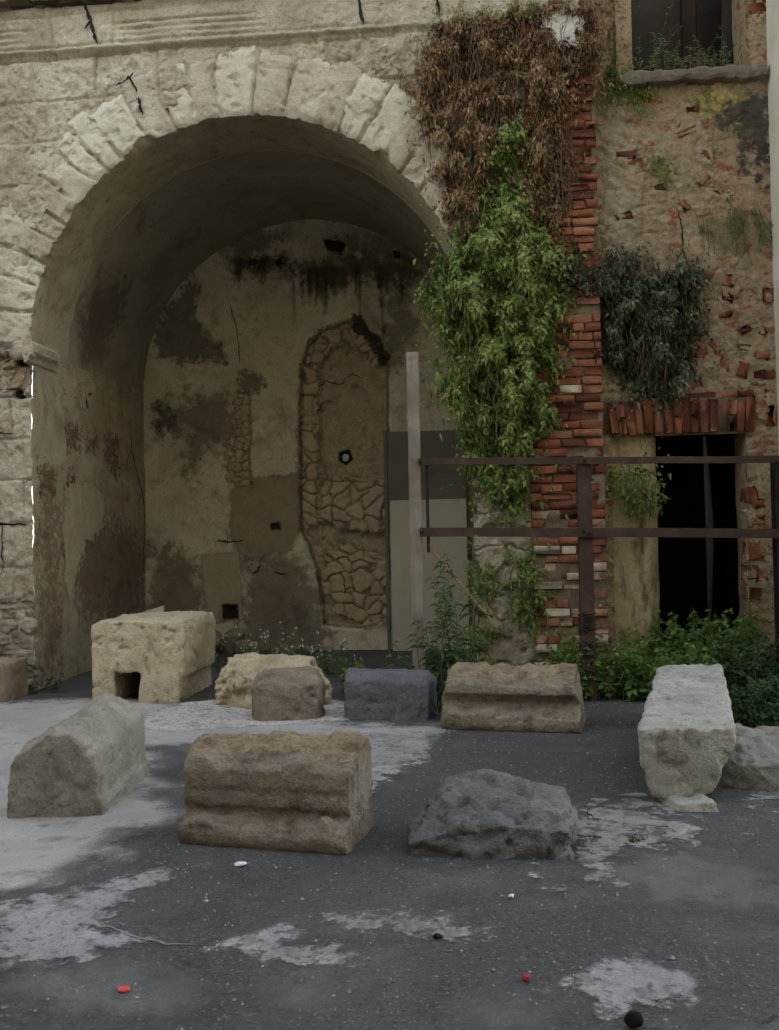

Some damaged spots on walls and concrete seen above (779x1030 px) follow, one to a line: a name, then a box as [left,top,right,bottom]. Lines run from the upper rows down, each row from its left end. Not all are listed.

spalling [600,95,736,267]
leakage [220,229,423,361]
spalling [351,313,389,365]
spalling [673,263,778,428]
leakage [152,388,238,482]
spalling [339,450,353,465]